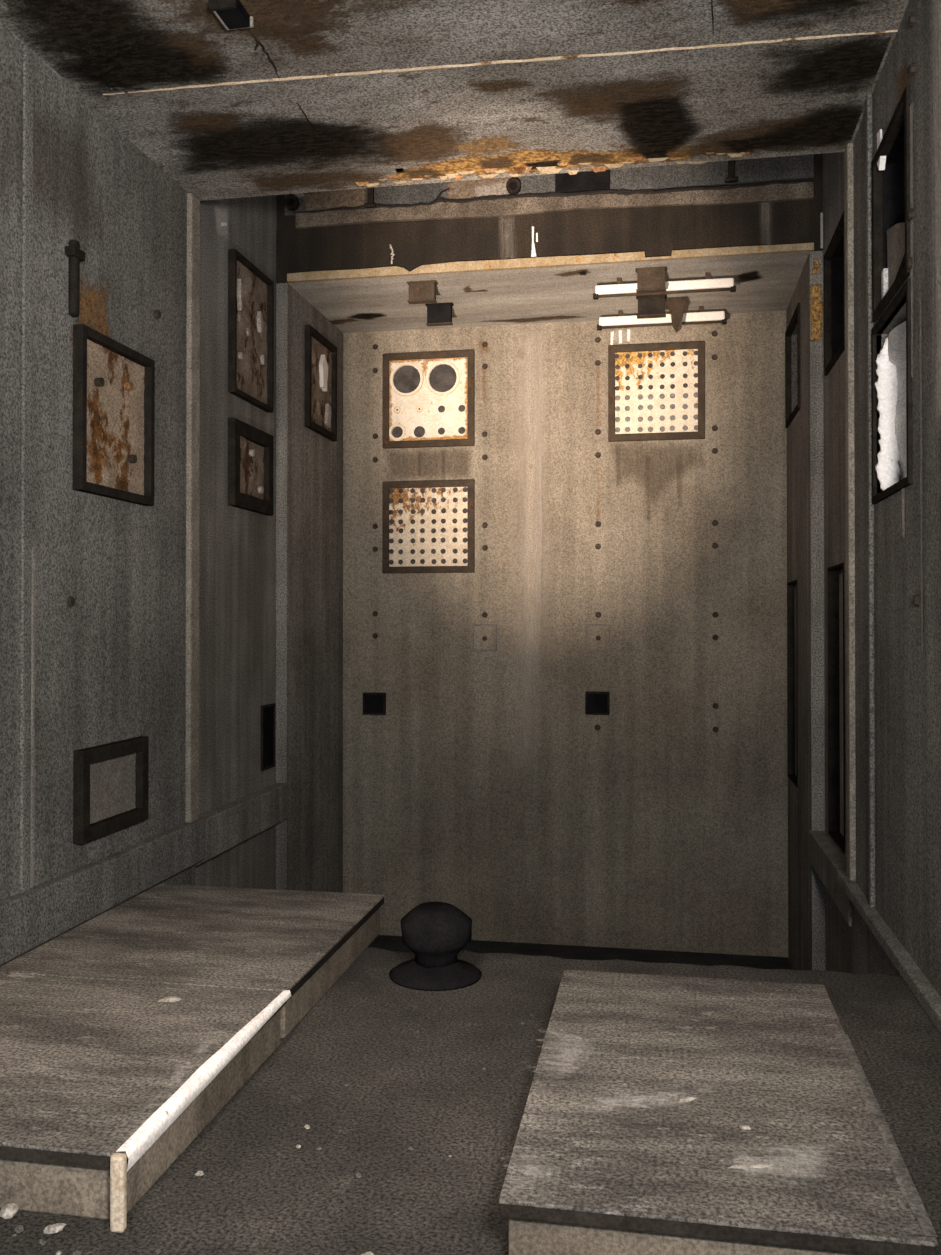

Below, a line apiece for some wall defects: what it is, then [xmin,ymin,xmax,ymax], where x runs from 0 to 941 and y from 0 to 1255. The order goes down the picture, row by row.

water stain [724,0,871,24]
water stain [6,0,418,100]
crack [252,36,280,78]
water stain [471,36,891,156]
water stain [171,112,462,174]
corrosion [254,136,700,192]
water stain [737,271,761,282]
water stain [910,0,941,653]